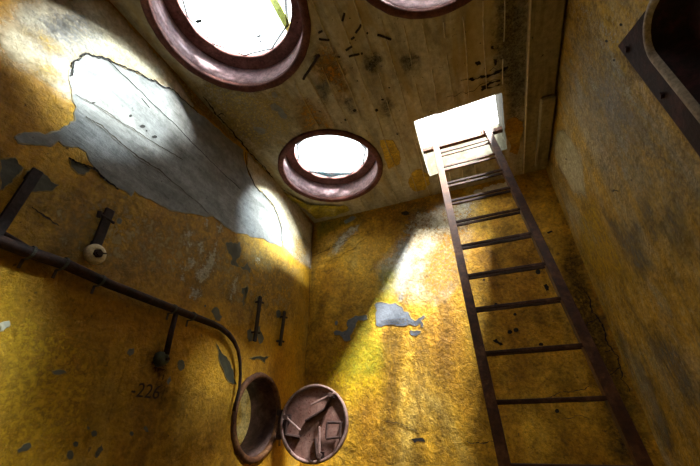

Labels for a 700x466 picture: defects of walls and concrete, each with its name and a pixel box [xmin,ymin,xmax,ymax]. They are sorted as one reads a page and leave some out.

peeling [0,0,312,307]
peeling [216,343,236,385]
peeling [333,301,426,342]
crack [585,292,630,392]